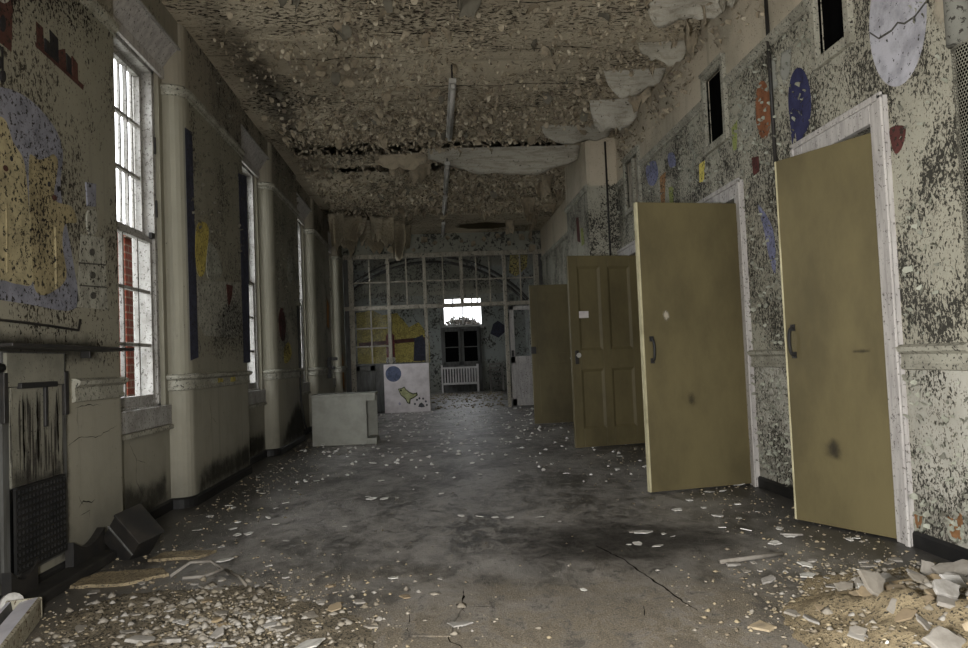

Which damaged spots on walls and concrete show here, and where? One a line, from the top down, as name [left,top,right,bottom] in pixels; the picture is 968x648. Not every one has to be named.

peeling [195,0,765,261]
peeling [640,11,844,347]
peeling [898,256,938,296]
water stain [9,389,65,479]
peeling [751,366,792,487]
peeling [901,372,968,544]
crack [597,546,698,611]